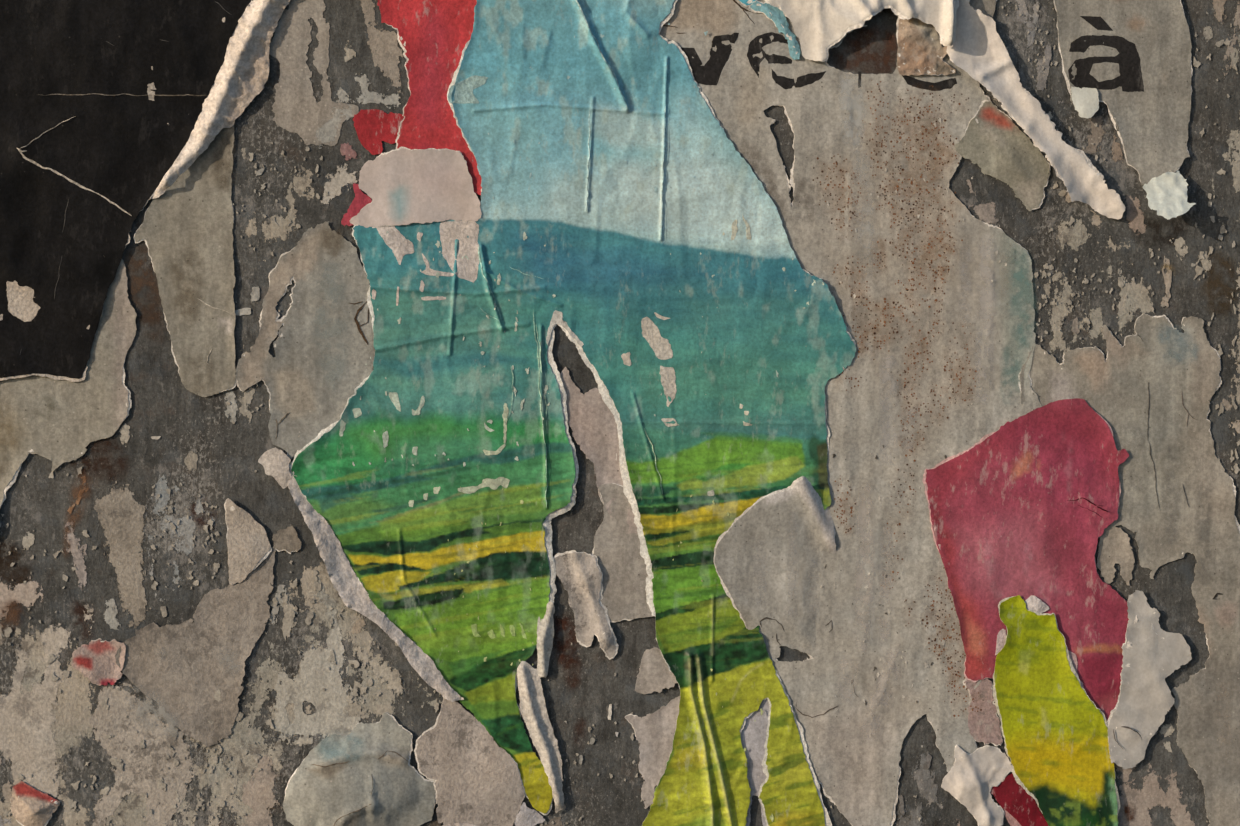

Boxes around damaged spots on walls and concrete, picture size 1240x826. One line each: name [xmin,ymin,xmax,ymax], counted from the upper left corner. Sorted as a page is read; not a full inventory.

rust [838,30,897,71]
peeling [233,0,416,262]
peeling [0,281,41,322]
peeling [223,383,262,424]
peeling [376,220,501,300]
peeling [546,294,584,347]
peeling [641,312,679,427]
rust [813,81,977,589]
peeling [1034,110,1240,353]
peeling [1096,526,1135,586]
peeling [0,450,442,826]
peeling [1114,723,1210,826]